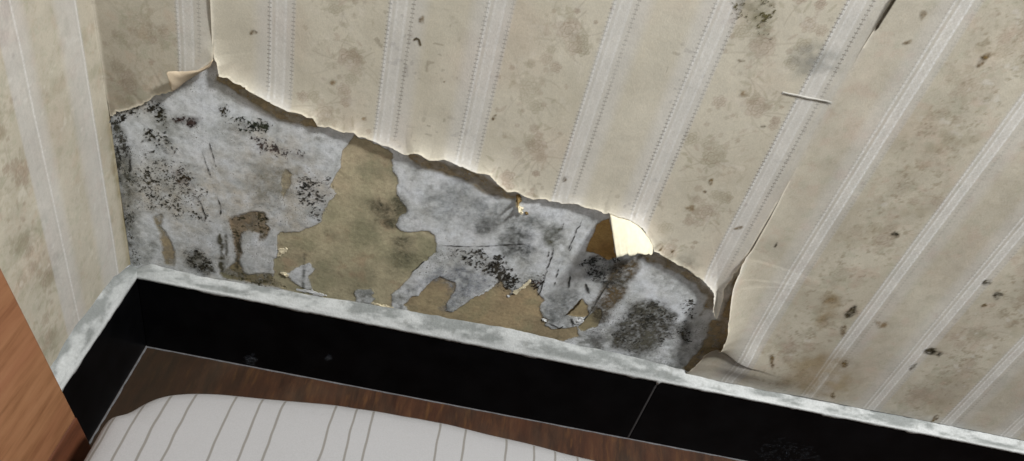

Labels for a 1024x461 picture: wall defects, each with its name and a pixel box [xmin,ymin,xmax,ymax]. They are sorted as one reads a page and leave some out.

mould [219,107,305,157]
mould [109,101,211,265]
mould [258,170,334,221]
peeling [154,216,175,265]
mould [185,234,241,274]
peeling [220,135,602,341]
mould [435,218,545,296]
water stain [579,255,696,354]